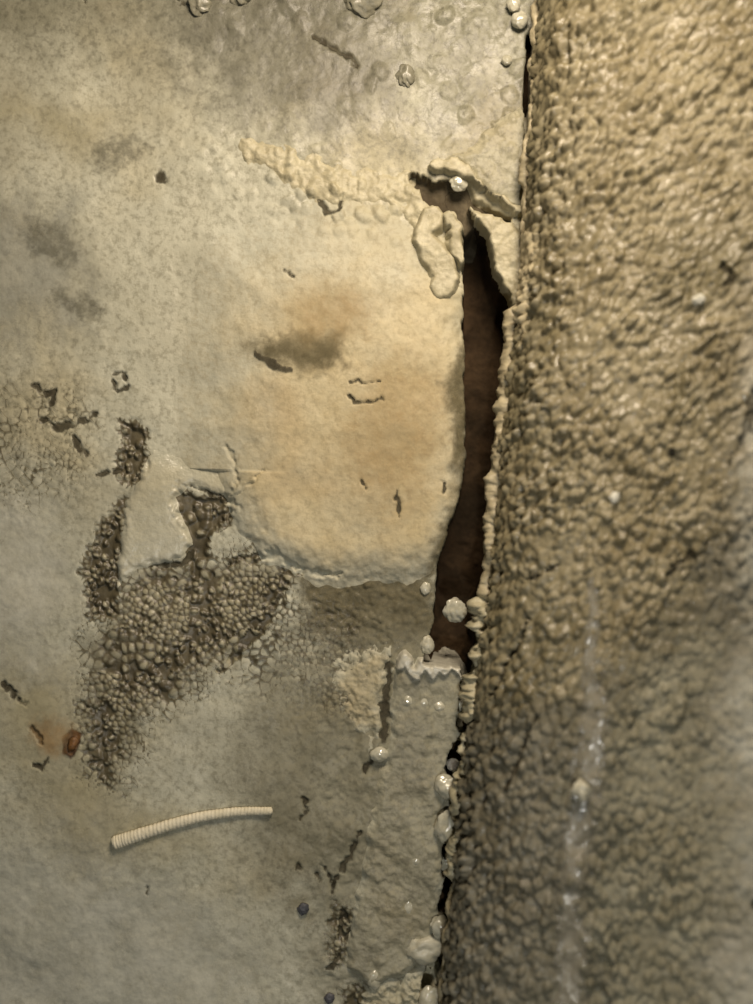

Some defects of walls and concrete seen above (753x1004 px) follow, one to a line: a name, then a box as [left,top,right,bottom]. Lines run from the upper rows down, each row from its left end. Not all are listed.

crack [111,372,129,392]
crack [31,383,122,476]
crack [393,490,401,514]
leakage [196,0,753,1004]
crack [150,550,194,568]
spalling [67,418,376,801]
corrosion [62,729,81,758]